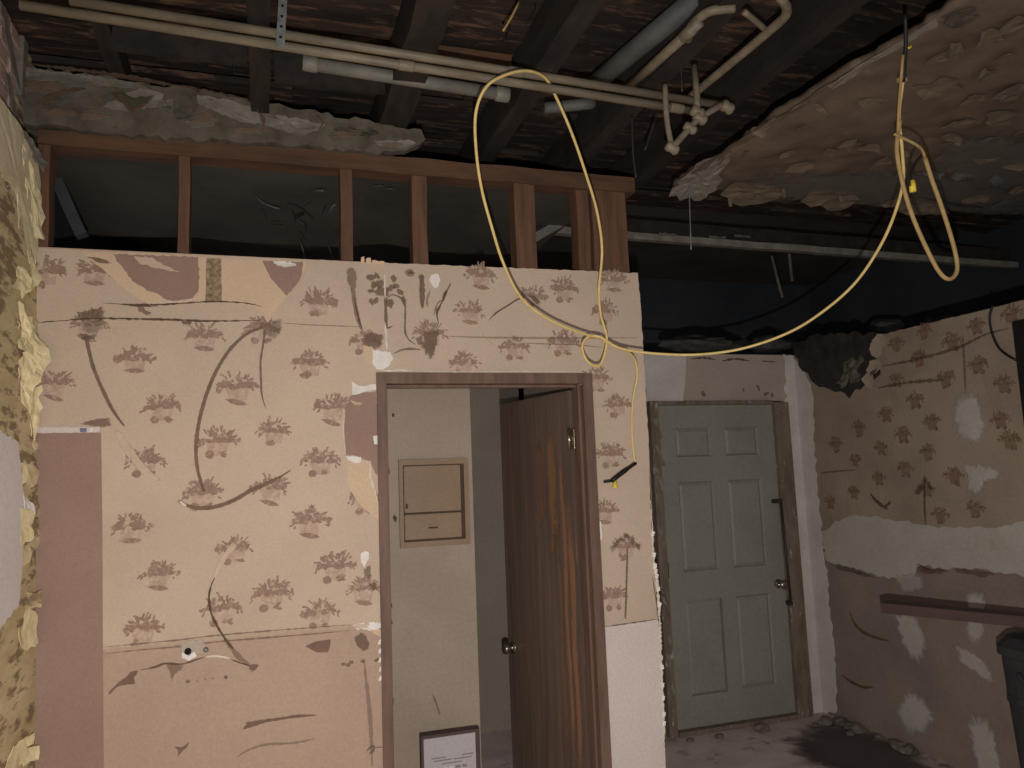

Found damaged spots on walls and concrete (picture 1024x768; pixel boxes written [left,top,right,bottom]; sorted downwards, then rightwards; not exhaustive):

flaking render [26,67,174,112]
flaking render [197,94,325,136]
flaking render [373,139,416,148]
crack [40,301,262,324]
hole [791,331,889,398]
peeling [0,99,110,768]
crack [142,543,258,671]
water stain [794,724,931,768]